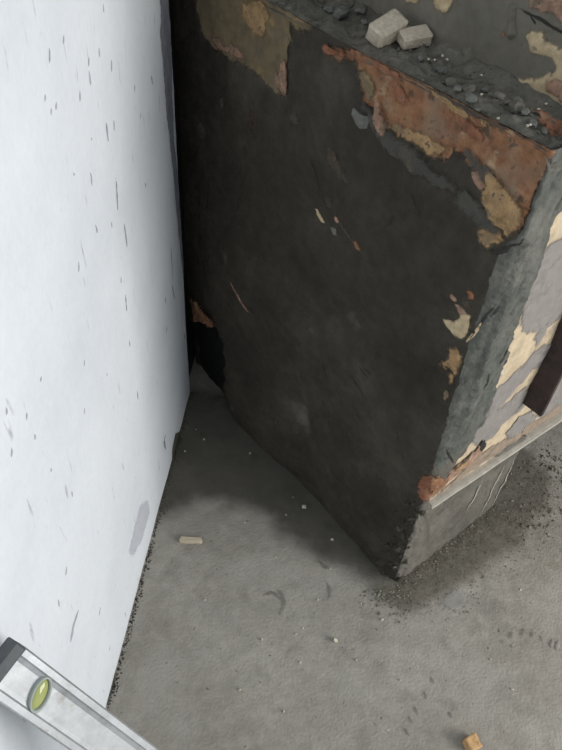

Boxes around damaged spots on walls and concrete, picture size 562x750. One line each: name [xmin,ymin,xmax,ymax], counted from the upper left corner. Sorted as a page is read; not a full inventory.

flaking render [196,0,322,95]
flaking render [519,31,562,105]
spalling [322,45,556,248]
spalling [443,291,474,339]
spalling [442,348,461,401]